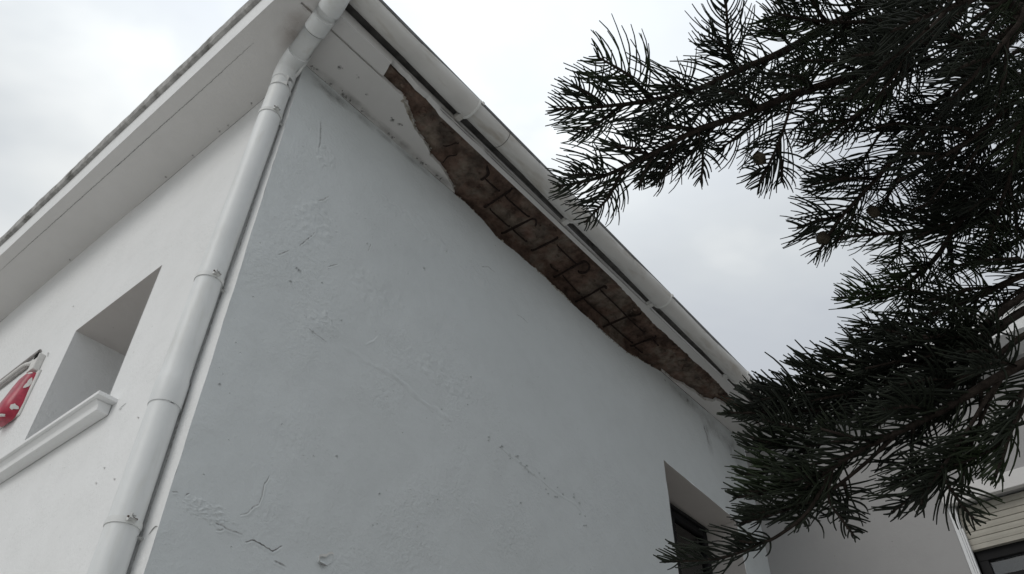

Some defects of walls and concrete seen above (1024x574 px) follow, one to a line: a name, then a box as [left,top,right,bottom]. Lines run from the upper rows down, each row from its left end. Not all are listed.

spalling [384,65,738,429]
crack [215,476,286,570]